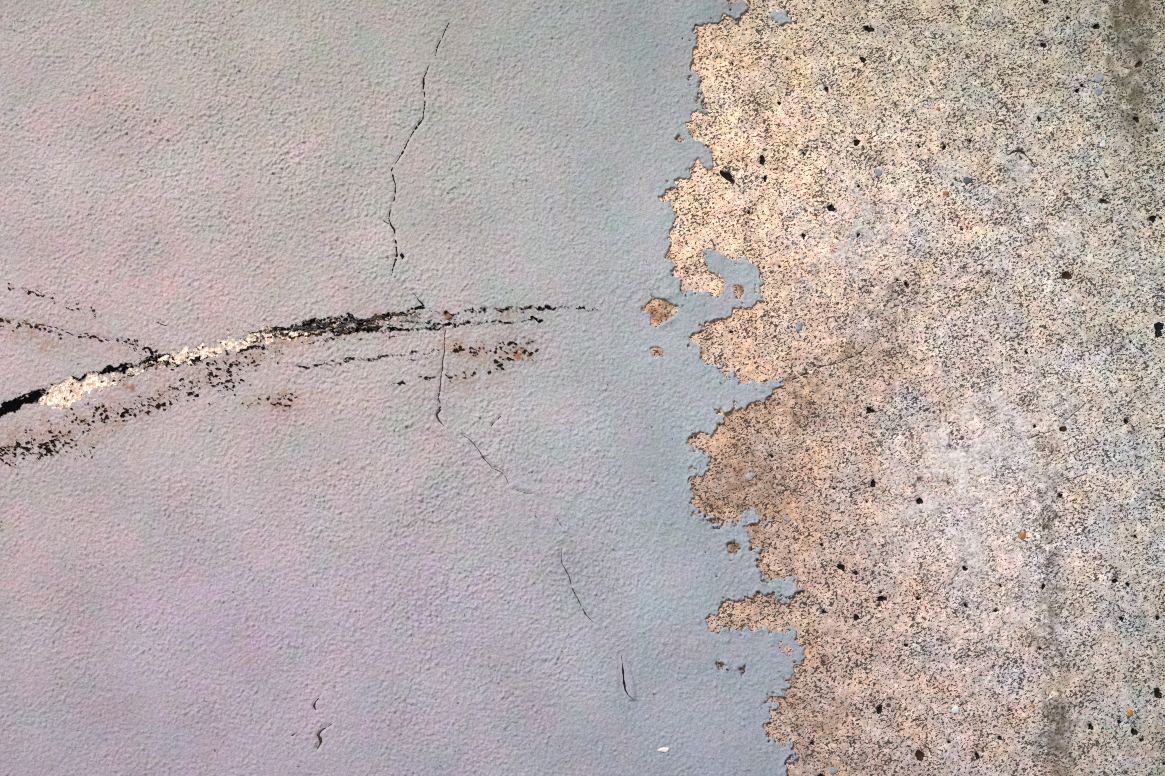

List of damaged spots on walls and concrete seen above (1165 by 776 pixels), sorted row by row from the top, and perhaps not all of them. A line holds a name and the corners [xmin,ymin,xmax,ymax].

crack [383,23,449,309]
crack [0,283,144,349]
crack [436,330,531,494]
peeling [642,0,1165,776]